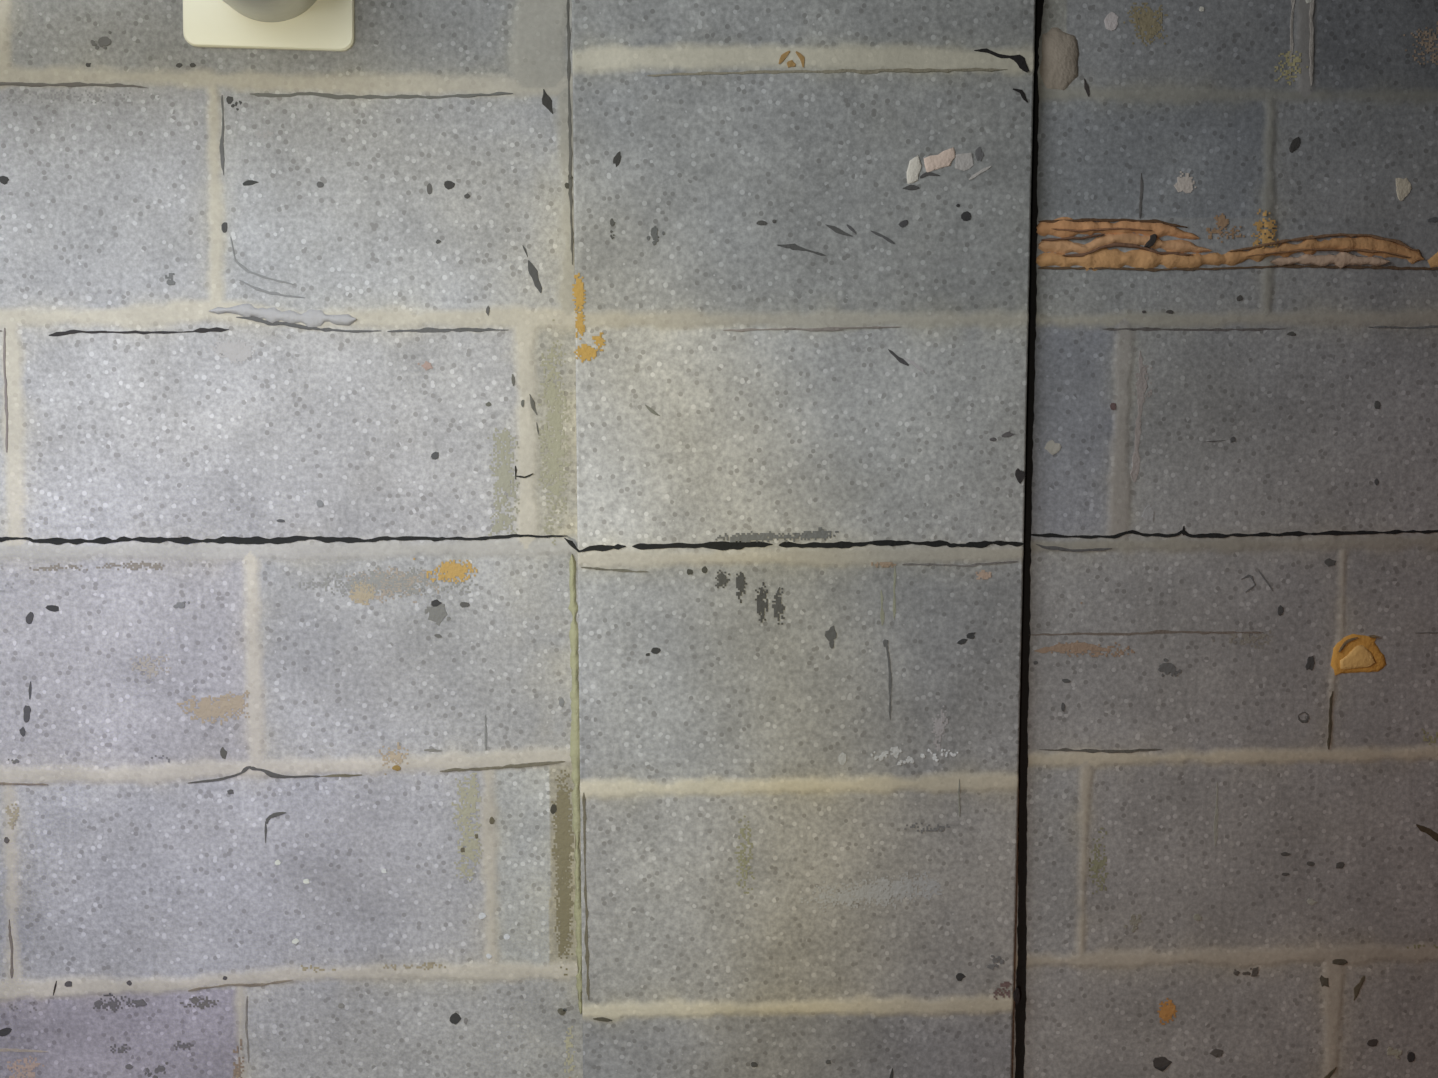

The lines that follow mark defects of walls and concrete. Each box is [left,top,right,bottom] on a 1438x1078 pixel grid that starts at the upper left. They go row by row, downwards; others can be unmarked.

crack [647,68,1007,77]
crack [566,0,574,265]
spalling [903,147,991,190]
crack [723,325,898,333]
crack [0,534,773,552]
crack [779,0,1438,1078]
crack [581,565,648,573]
corrosion [1331,634,1386,675]